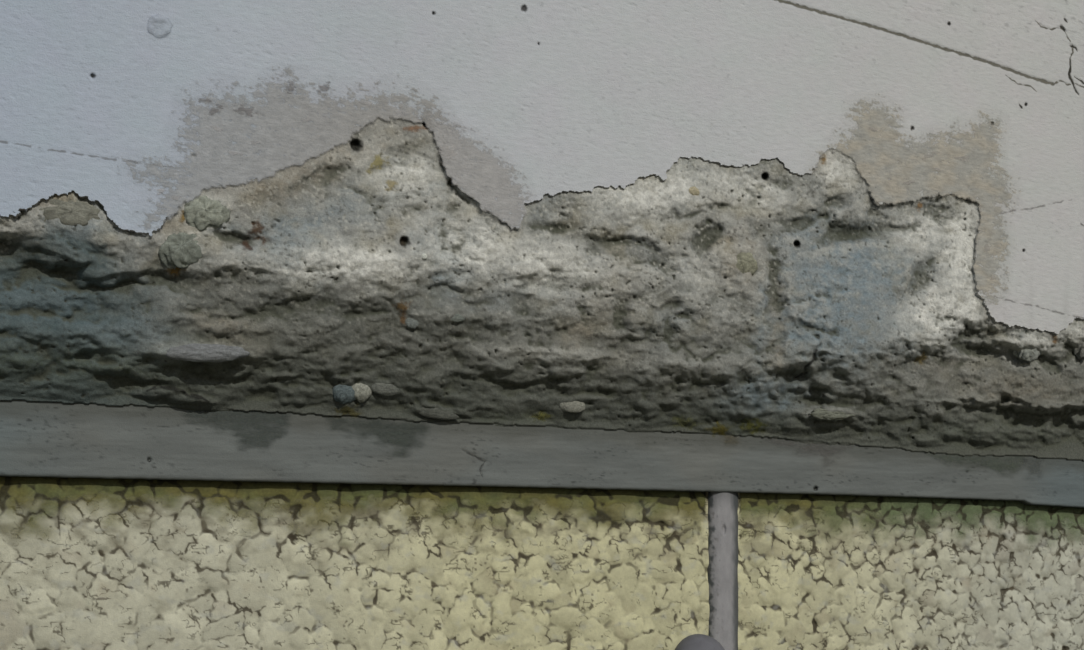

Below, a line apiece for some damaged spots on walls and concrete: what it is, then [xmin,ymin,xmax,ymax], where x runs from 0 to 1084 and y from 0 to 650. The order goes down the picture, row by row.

crack [778,0,1084,108]
spalling [0,68,1084,461]